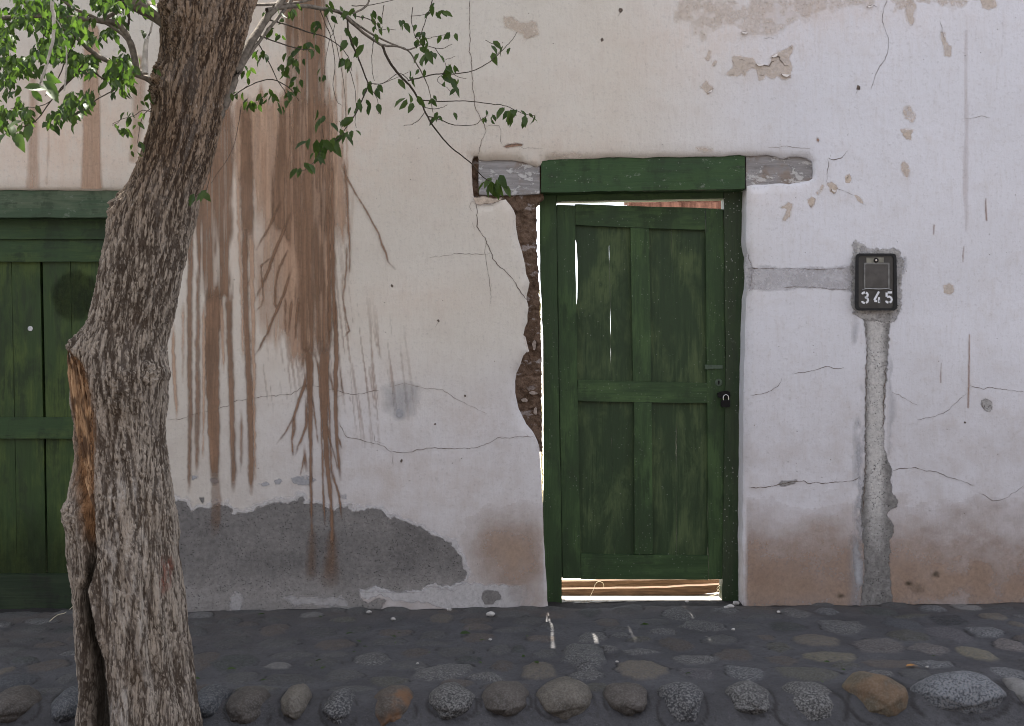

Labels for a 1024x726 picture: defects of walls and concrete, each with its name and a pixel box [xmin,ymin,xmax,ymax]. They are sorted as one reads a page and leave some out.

peeling [728,46,793,80]
water stain [172,107,256,487]
crack [430,201,526,304]
flaking render [472,156,544,452]
crack [751,477,859,488]
flaking render [174,476,469,612]
water stain [747,530,867,606]
water stain [889,543,1024,605]